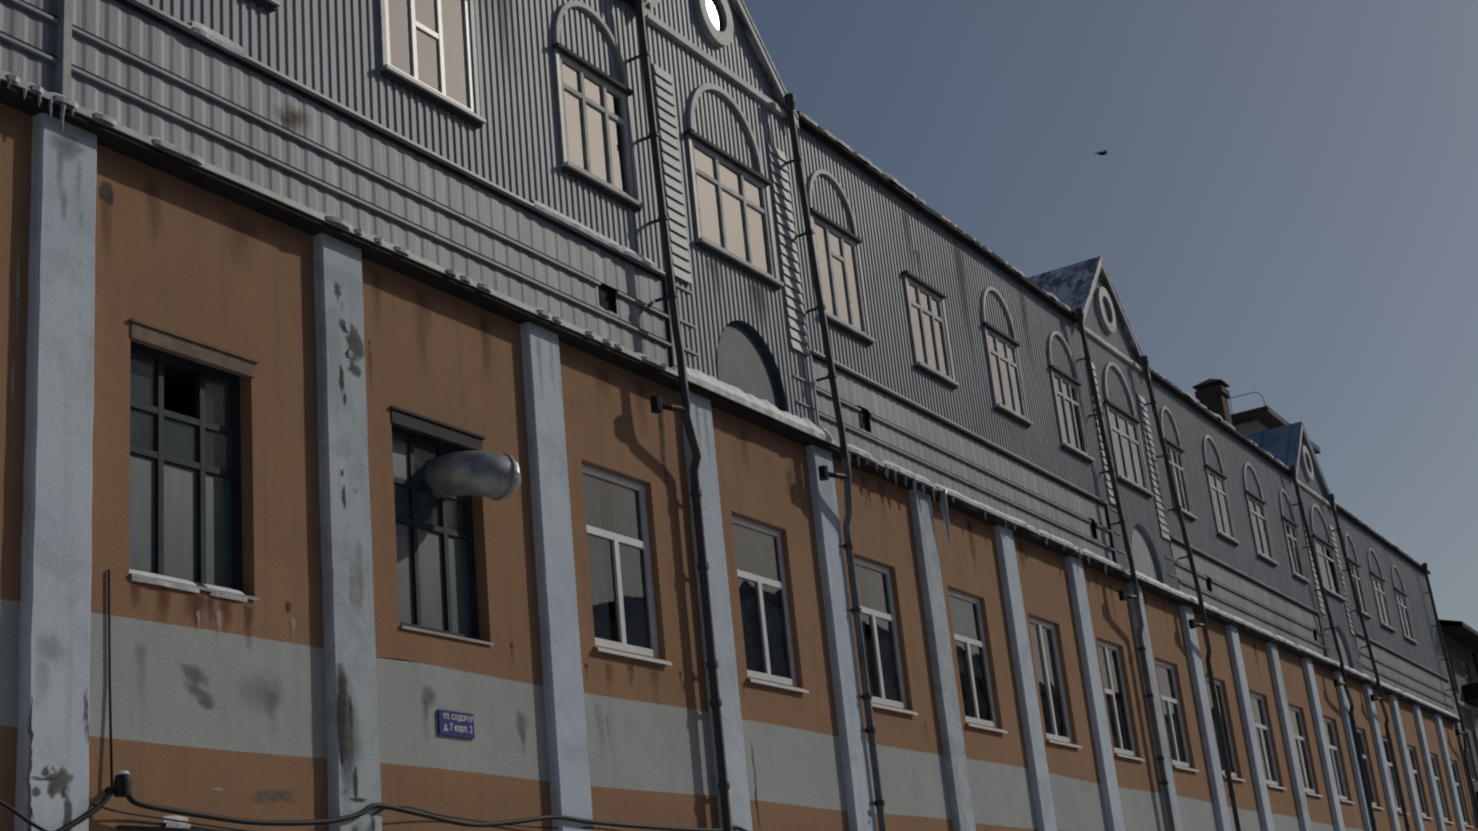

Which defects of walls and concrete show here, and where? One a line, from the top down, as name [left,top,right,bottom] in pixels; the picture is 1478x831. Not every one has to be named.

flaking render [340,319,364,404]
crack [27,696,61,831]
flaking render [33,765,72,831]